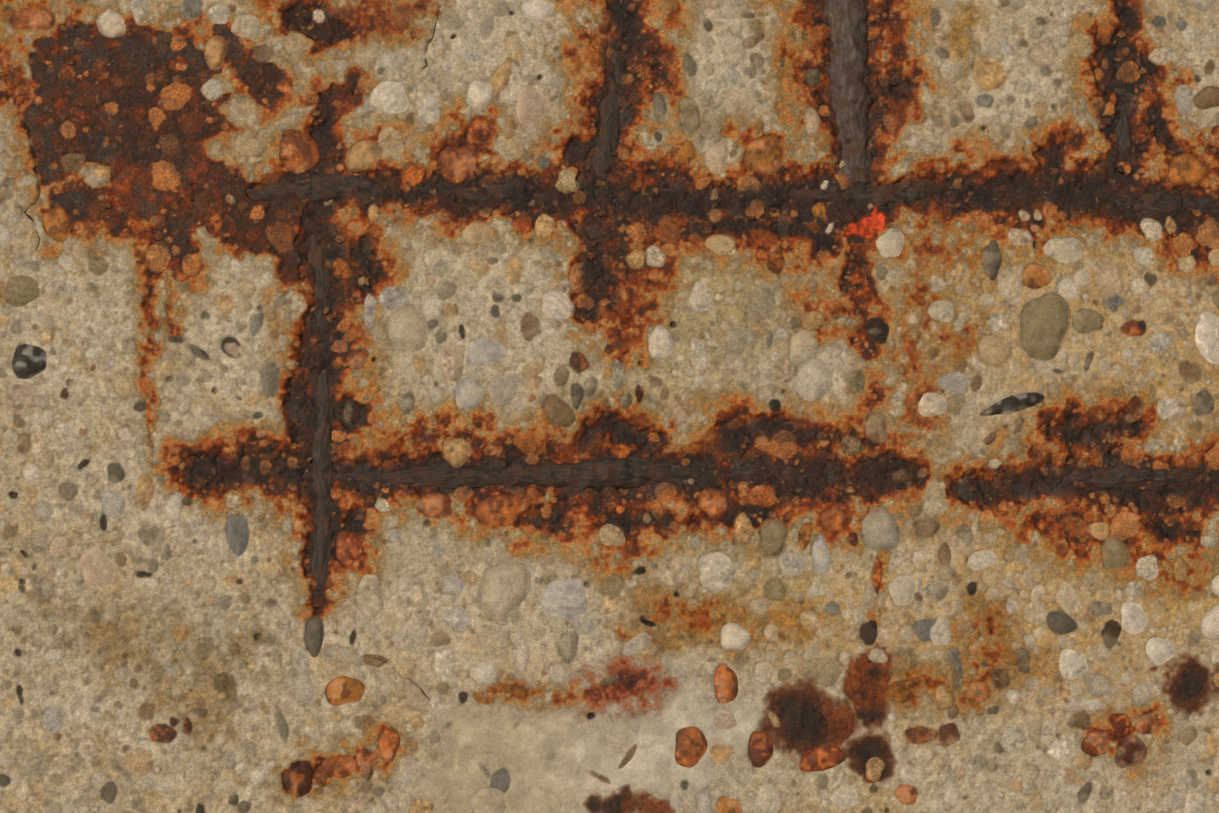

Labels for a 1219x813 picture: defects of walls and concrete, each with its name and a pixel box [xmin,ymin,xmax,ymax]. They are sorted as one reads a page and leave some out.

corrosion [0,0,605,224]
corrosion [627,0,835,185]
corrosion [871,0,1120,184]
corrosion [1120,0,1219,182]
spalling [22,0,1219,616]
corrosion [37,205,1219,716]
corrosion [266,717,417,803]
corrosion [585,785,673,813]
corrosion [761,596,1023,783]
corrosion [1077,655,1219,781]